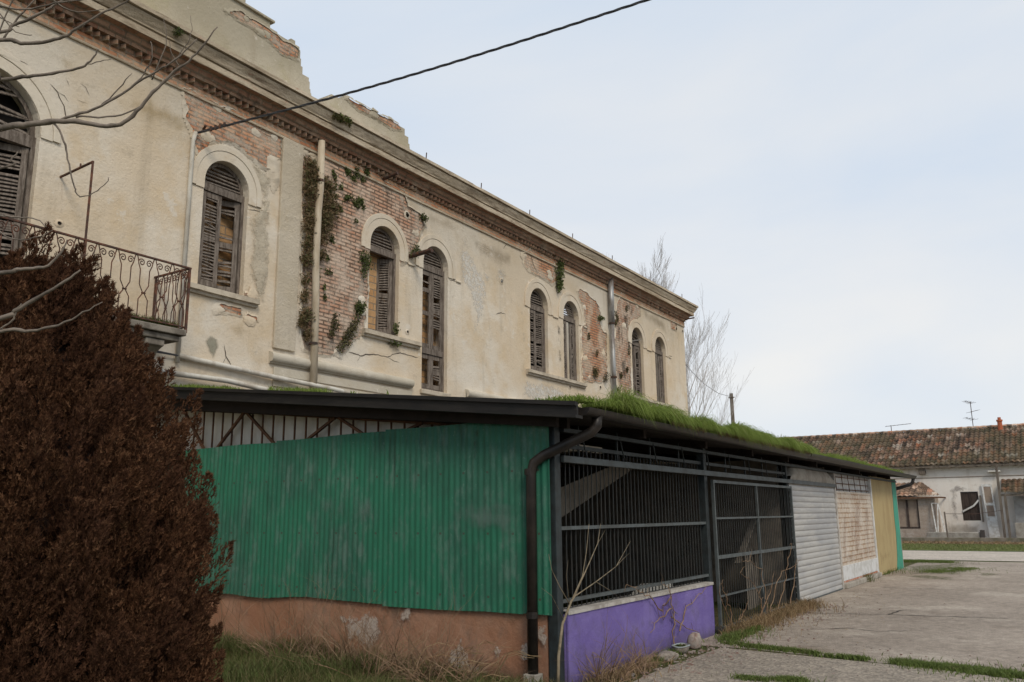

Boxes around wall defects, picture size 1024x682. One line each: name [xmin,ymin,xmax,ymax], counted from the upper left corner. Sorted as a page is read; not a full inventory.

flaking render [223,7,300,62]
flaking render [344,95,403,132]
flaking render [181,87,282,327]
flaking render [520,248,558,287]
crack [350,352,418,362]
flaking render [568,287,641,394]
peeling [340,614,380,648]